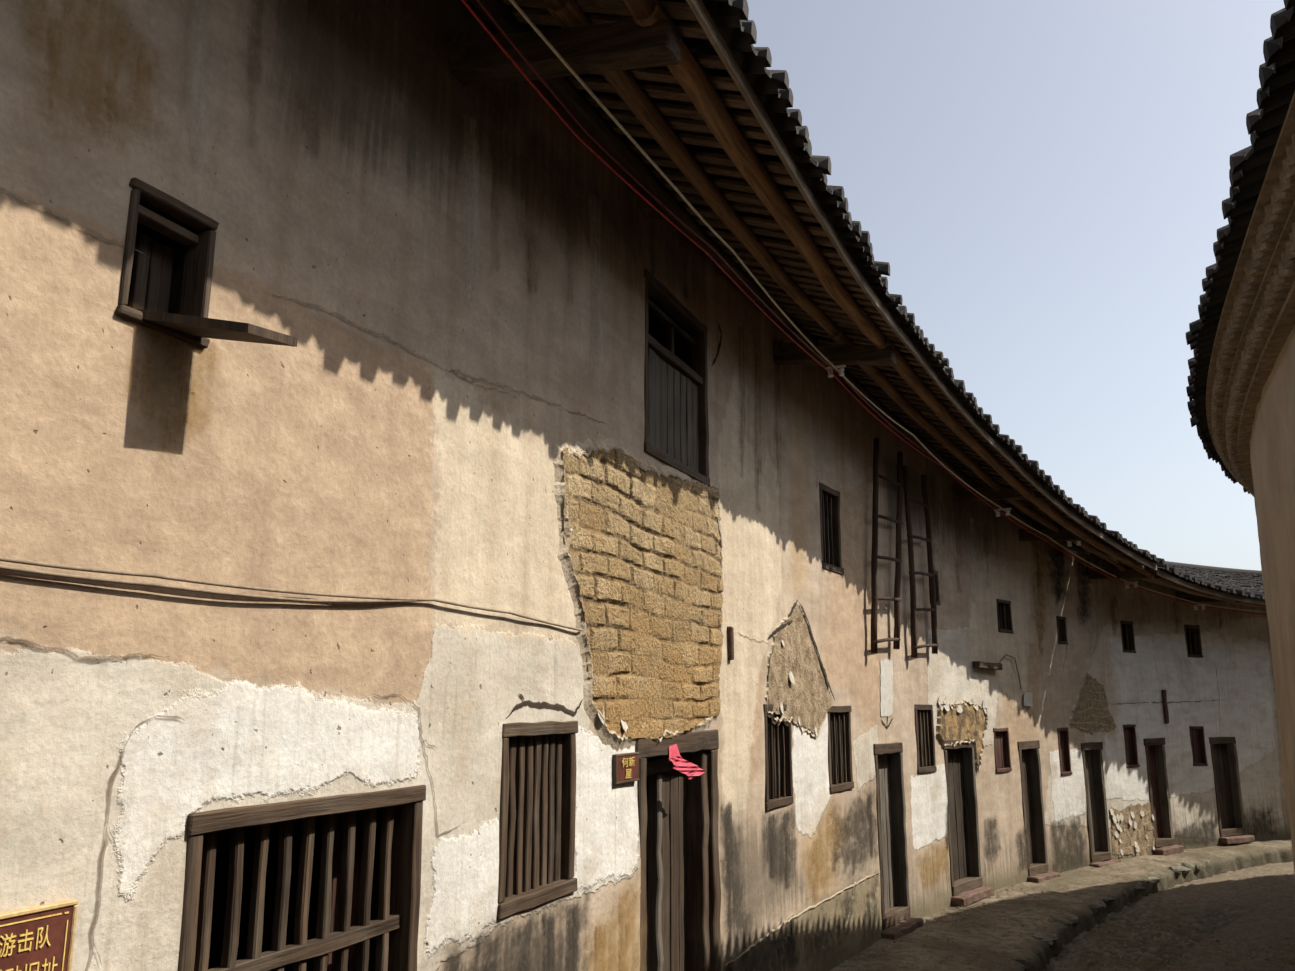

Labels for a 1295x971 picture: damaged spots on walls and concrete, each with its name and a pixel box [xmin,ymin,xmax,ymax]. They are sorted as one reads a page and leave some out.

flaking render [553,437,724,752]
flaking render [764,603,832,740]
flaking render [936,696,988,773]
flaking render [1068,672,1116,736]
crack [86,715,181,971]
damp [834,795,877,874]
peeling [1109,802,1155,857]
damp [721,805,796,971]
damp [447,955,460,971]
damp [518,907,579,971]